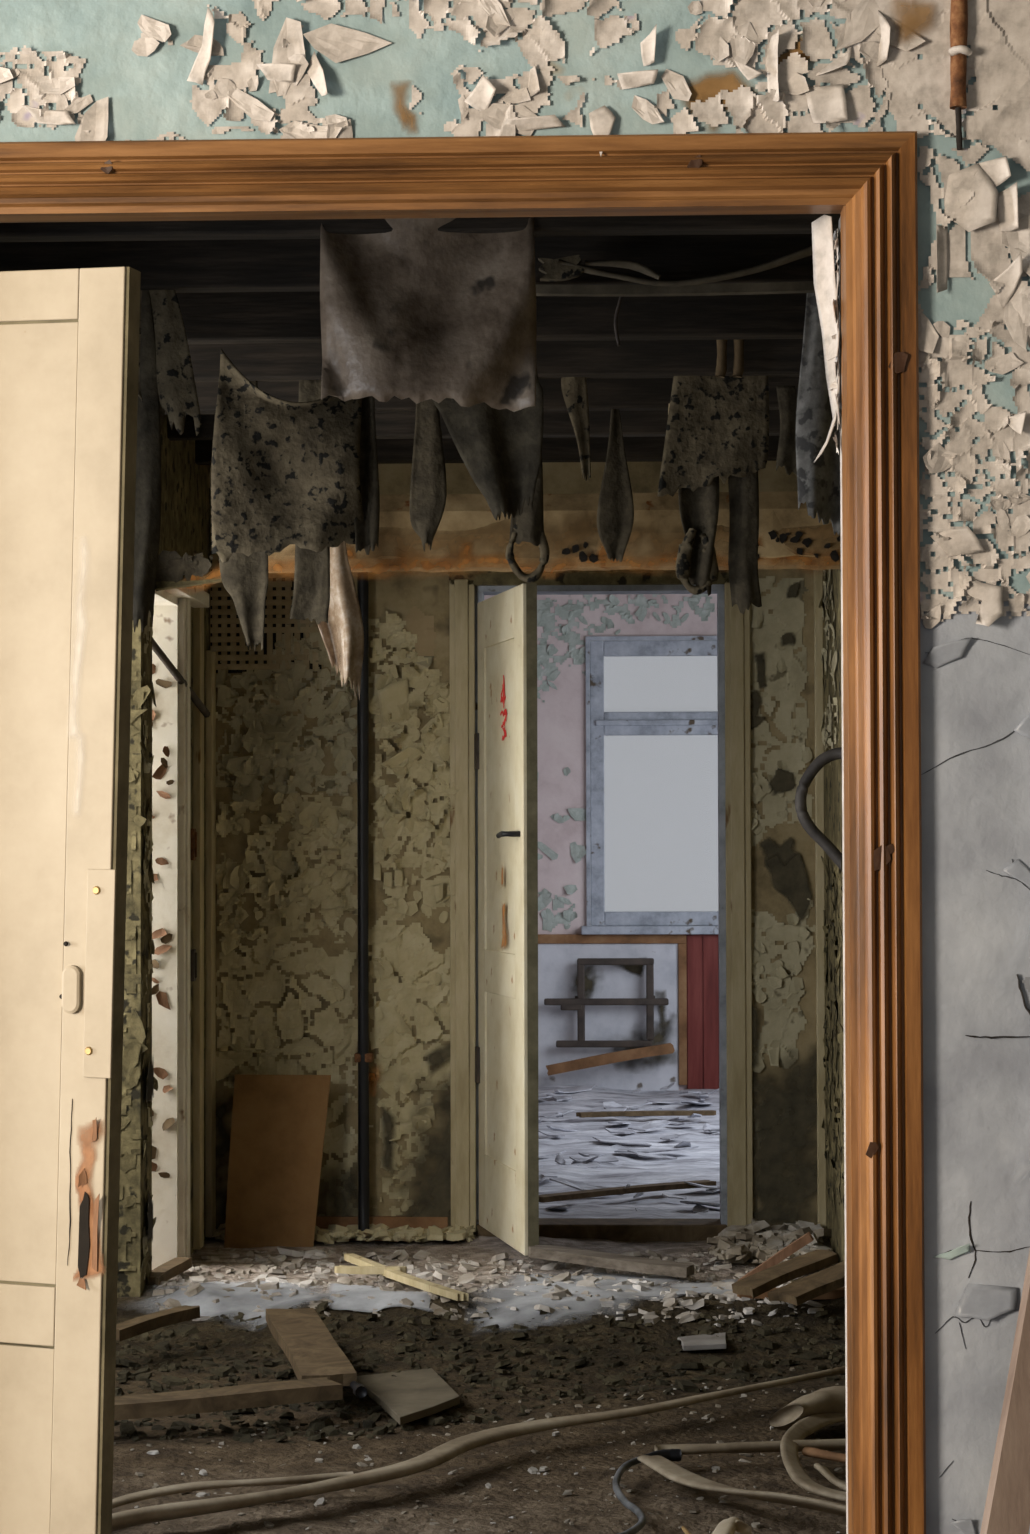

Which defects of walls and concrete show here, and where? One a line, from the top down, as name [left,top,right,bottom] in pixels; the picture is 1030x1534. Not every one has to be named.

peeling [0,45,109,141]
peeling [125,0,1030,629]
corrosion [165,569,221,591]
corrosion [268,562,295,574]
peeling [537,594,715,702]
crack [923,637,1030,668]
crack [921,713,1030,775]
peeling [215,606,460,1216]
peeling [750,569,844,1219]
crack [966,974,1030,1039]
crack [933,1201,1027,1348]